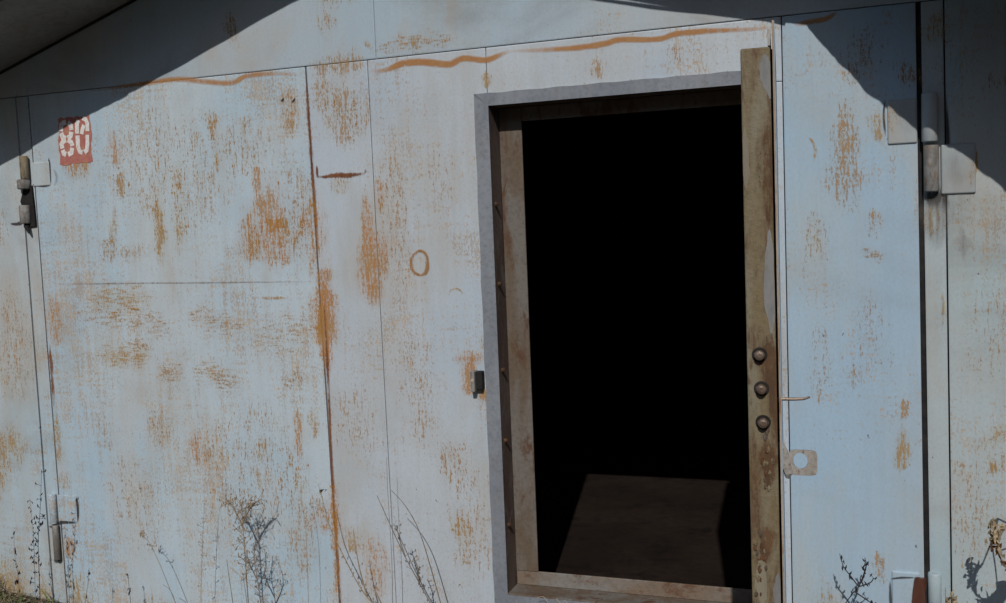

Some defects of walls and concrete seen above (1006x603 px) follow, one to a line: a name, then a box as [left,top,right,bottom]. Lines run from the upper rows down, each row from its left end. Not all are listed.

corrosion [546,29,737,63]
corrosion [826,102,894,206]
corrosion [77,284,165,367]
corrosion [102,34,501,603]
corrosion [758,336,777,439]
corrosion [895,432,910,469]